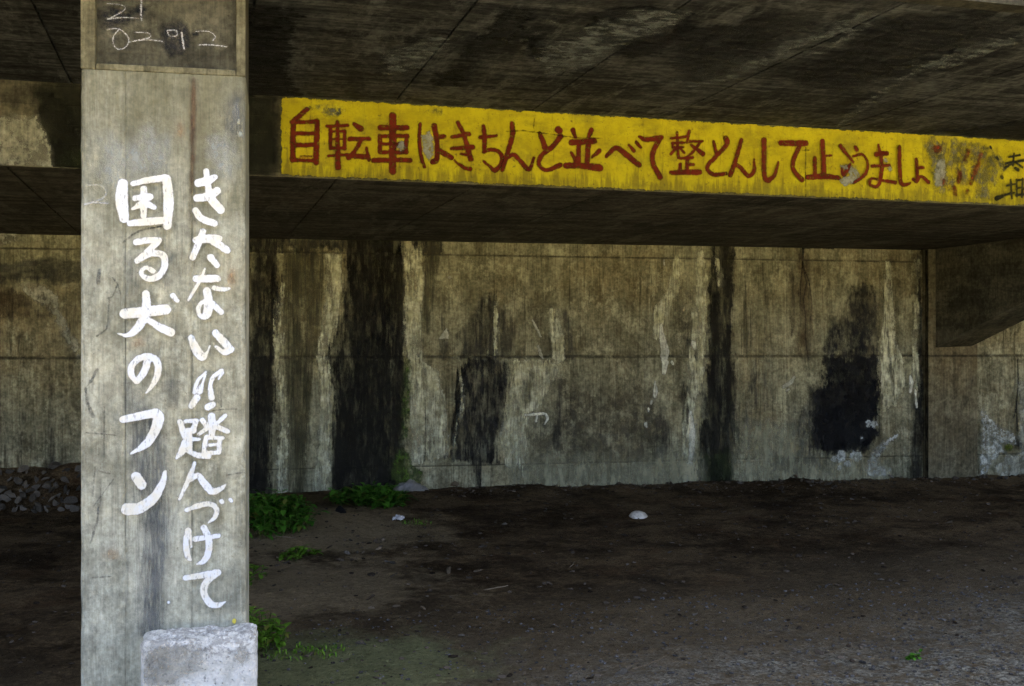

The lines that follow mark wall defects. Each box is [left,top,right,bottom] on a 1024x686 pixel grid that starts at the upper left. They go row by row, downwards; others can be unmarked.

peeling [421,131,434,159]
peeling [925,137,1006,199]
damp [249,238,929,495]
damp [995,381,1024,476]